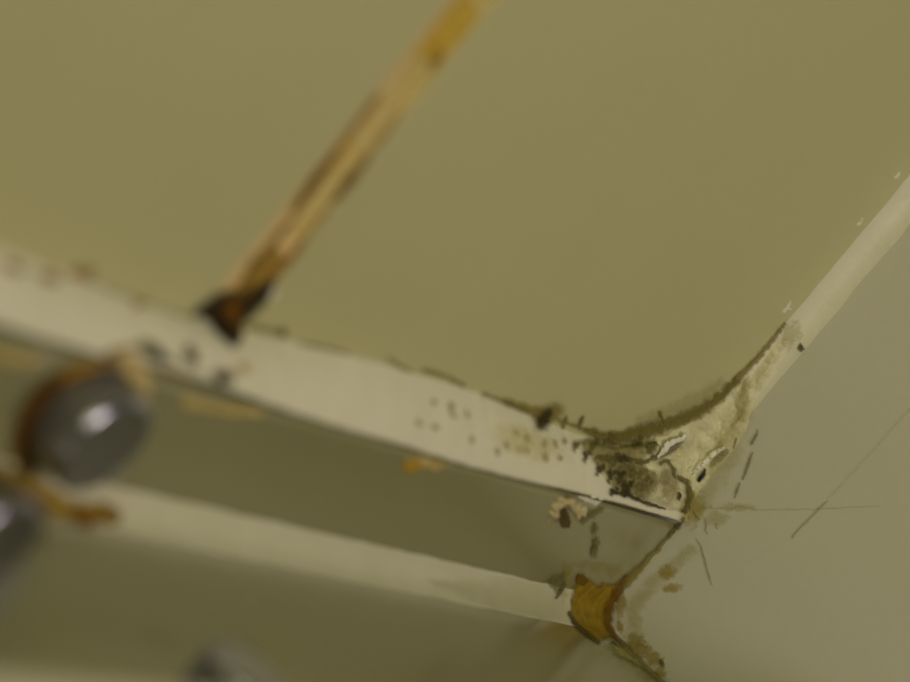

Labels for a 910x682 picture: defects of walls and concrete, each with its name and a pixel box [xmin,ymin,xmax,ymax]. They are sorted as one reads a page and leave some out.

rust [0,355,120,527]
leakage [543,416,706,514]
spalling [549,491,608,558]
rust [549,573,665,677]